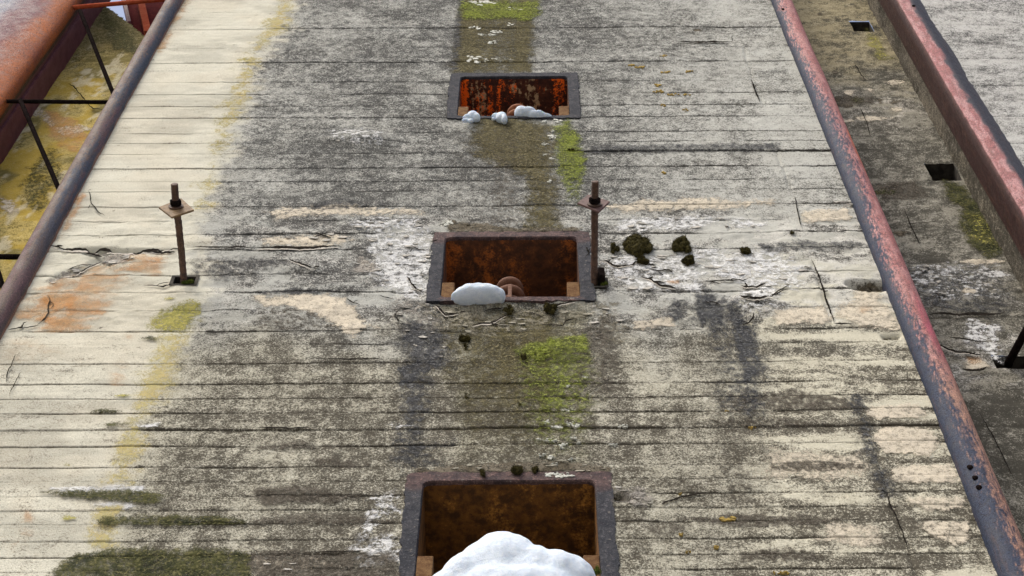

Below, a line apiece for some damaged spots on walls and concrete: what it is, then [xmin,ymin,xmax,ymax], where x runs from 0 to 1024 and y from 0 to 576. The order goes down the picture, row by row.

water stain [450,0,537,73]
water stain [452,118,563,232]
crack [50,233,339,276]
crack [812,261,852,325]
water stain [390,303,618,468]
water stain [664,287,769,501]
crack [886,492,908,549]